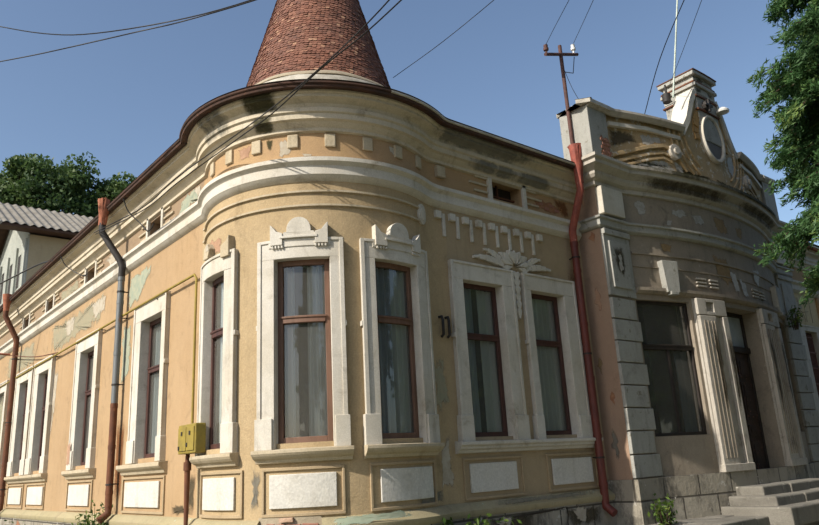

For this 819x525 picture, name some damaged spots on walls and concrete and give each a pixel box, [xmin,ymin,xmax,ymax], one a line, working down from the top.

peeling [129,266,151,307]
peeling [52,294,106,351]
peeling [8,342,34,378]
peeling [121,326,131,387]
damp [715,335,741,406]
flaking render [258,515,322,525]